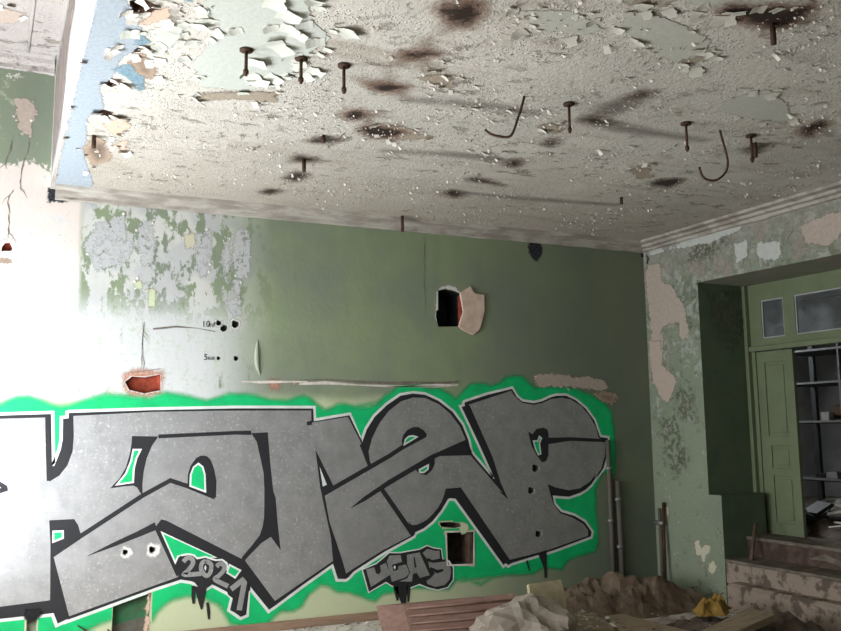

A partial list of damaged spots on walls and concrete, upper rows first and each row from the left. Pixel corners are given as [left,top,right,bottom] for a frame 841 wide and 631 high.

corrosion [716,2,816,31]
peeling [12,98,39,138]
peeling [54,0,841,237]
crack [0,139,30,243]
flaking render [0,238,18,272]
peeling [83,212,156,273]
peeling [184,228,252,330]
peeling [799,210,841,246]
spalling [435,285,485,335]
peeling [644,226,782,403]
flaking render [123,368,163,397]
spalling [534,372,618,405]